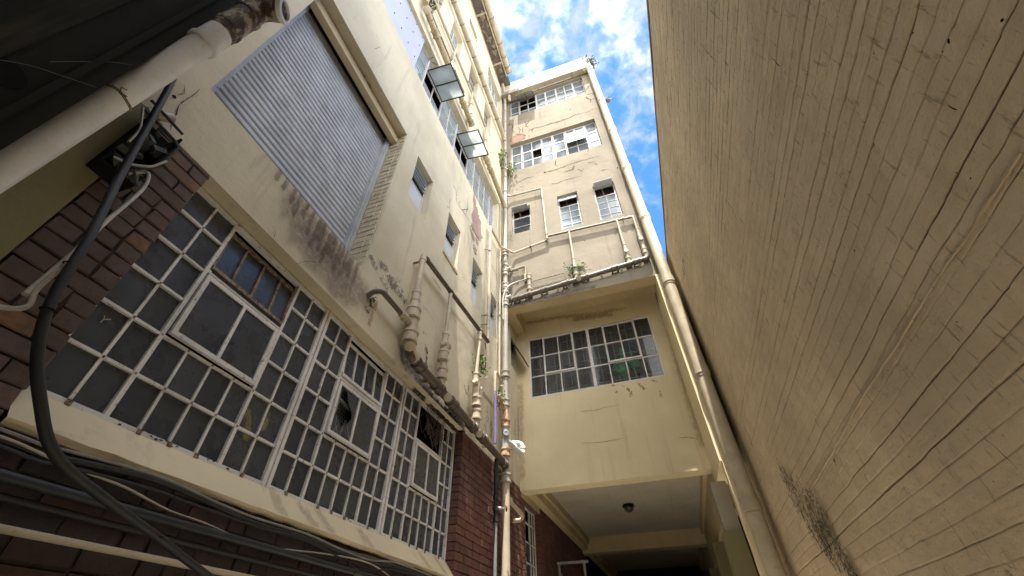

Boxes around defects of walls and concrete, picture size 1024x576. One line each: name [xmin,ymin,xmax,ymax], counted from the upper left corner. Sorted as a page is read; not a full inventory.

crack [517,149,605,184]
water stain [775,462,858,576]